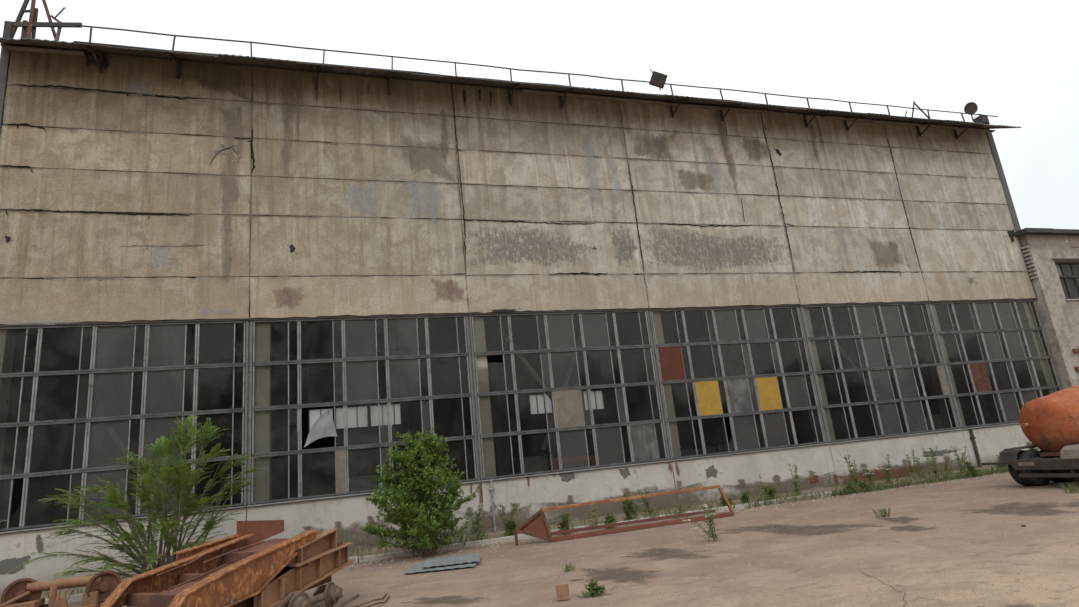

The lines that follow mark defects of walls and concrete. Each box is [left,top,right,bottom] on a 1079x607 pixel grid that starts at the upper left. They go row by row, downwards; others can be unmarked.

crack [16,84,209,100]
water stain [182,62,246,271]
crack [210,128,255,172]
water stain [407,112,450,179]
crack [0,209,191,219]